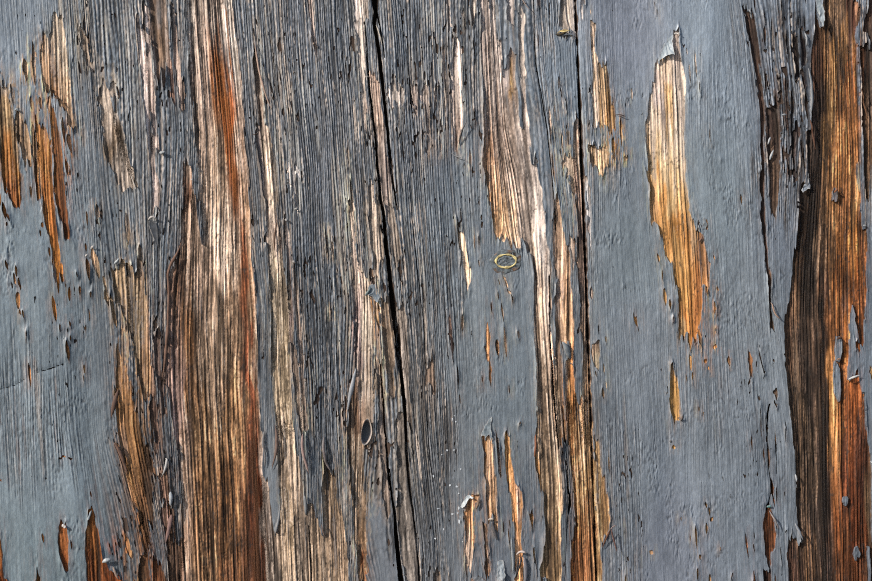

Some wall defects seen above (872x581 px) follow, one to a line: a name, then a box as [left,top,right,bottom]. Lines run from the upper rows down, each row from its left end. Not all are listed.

peeling [0,0,628,581]
crack [364,0,433,581]
peeling [645,29,719,425]
peeling [690,502,713,581]
peeling [742,0,872,581]